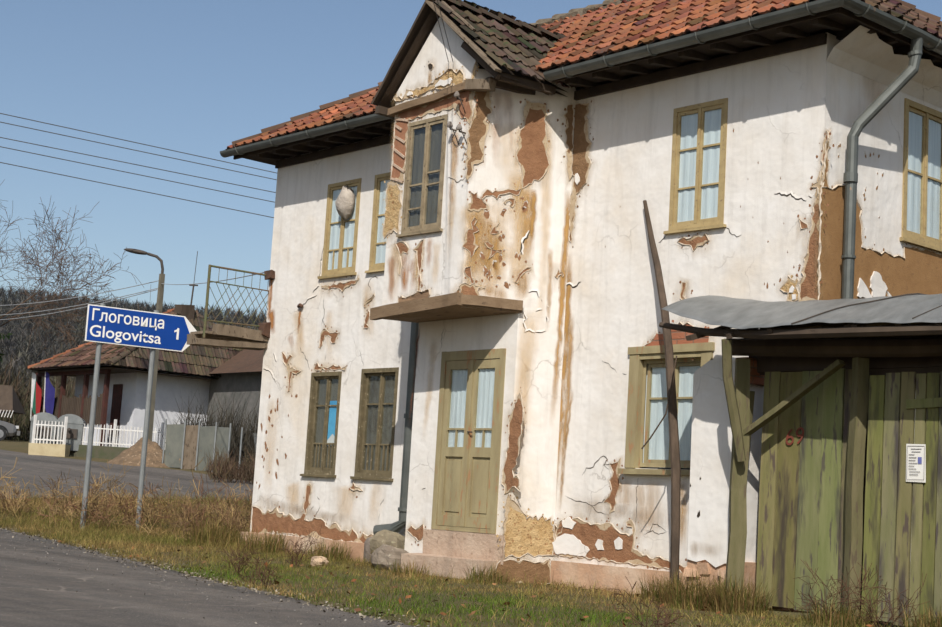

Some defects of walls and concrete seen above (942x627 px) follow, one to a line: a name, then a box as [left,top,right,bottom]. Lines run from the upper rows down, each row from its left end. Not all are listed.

spalling [382,61,594,302]
spalling [677,230,710,251]
spalling [764,130,942,302]
spalling [318,325,339,348]
spalling [260,352,347,479]
spalling [248,483,374,543]
spalling [496,387,687,584]